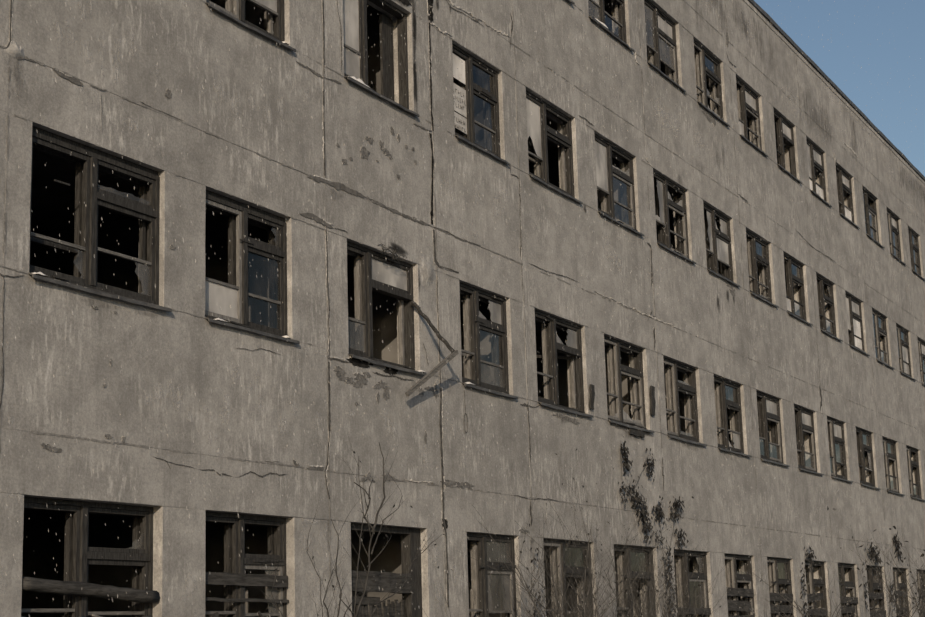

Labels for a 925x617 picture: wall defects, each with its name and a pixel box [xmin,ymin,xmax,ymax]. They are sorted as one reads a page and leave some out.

spalling [342,126,417,165]
crack [0,273,25,407]
spalling [330,355,398,433]
crack [155,457,286,478]